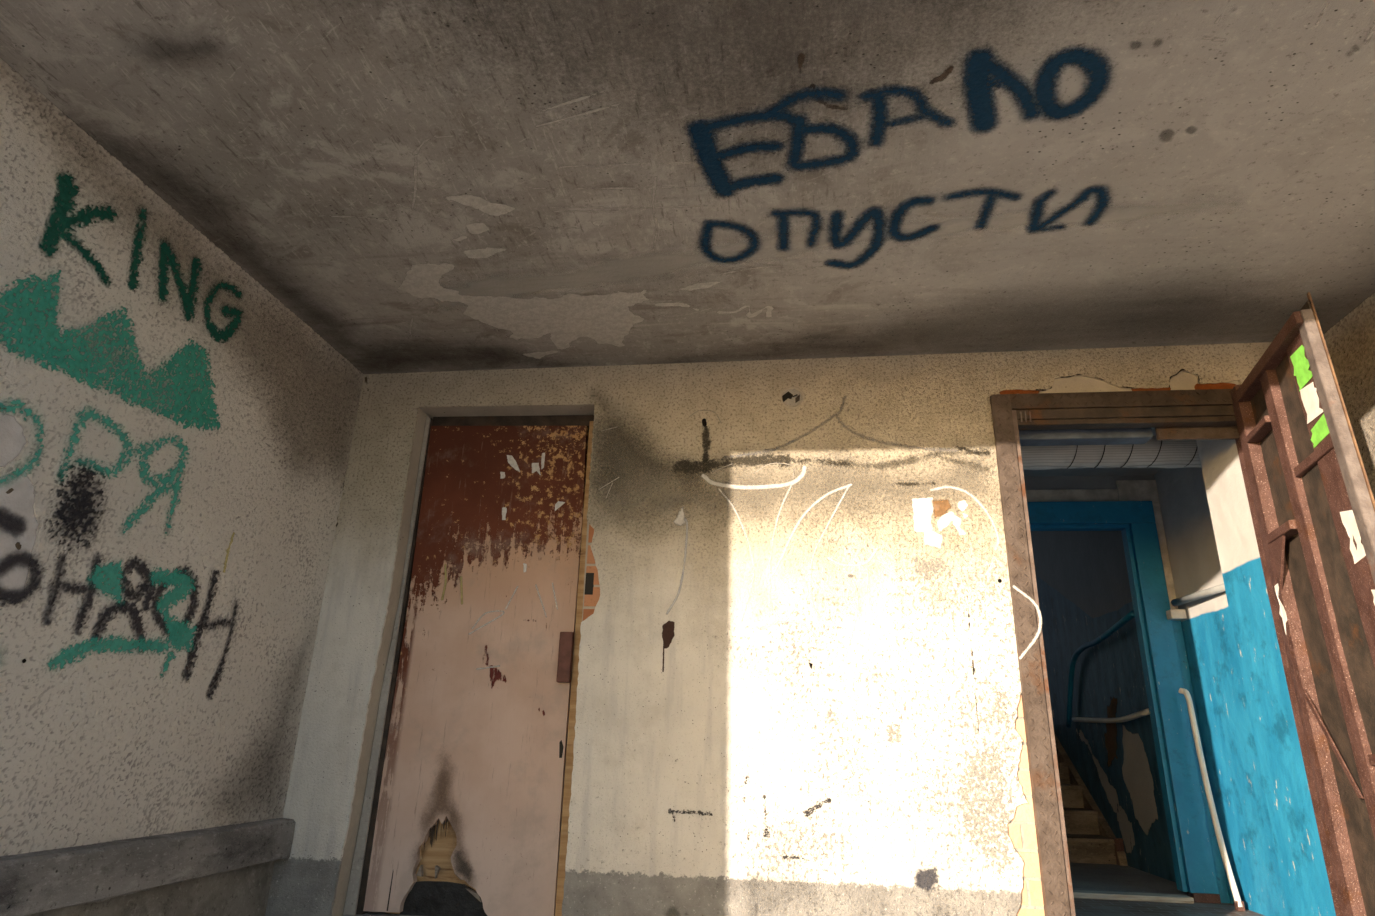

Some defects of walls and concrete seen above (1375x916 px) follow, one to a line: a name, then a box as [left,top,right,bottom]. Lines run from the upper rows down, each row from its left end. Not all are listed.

peeling [397,195,720,359]
flaking render [1035,374,1134,393]
flaking render [1169,369,1200,390]
flaking render [583,525,600,621]
peeling [914,555,951,580]
peeling [883,721,903,744]
flaking render [950,682,1045,916]